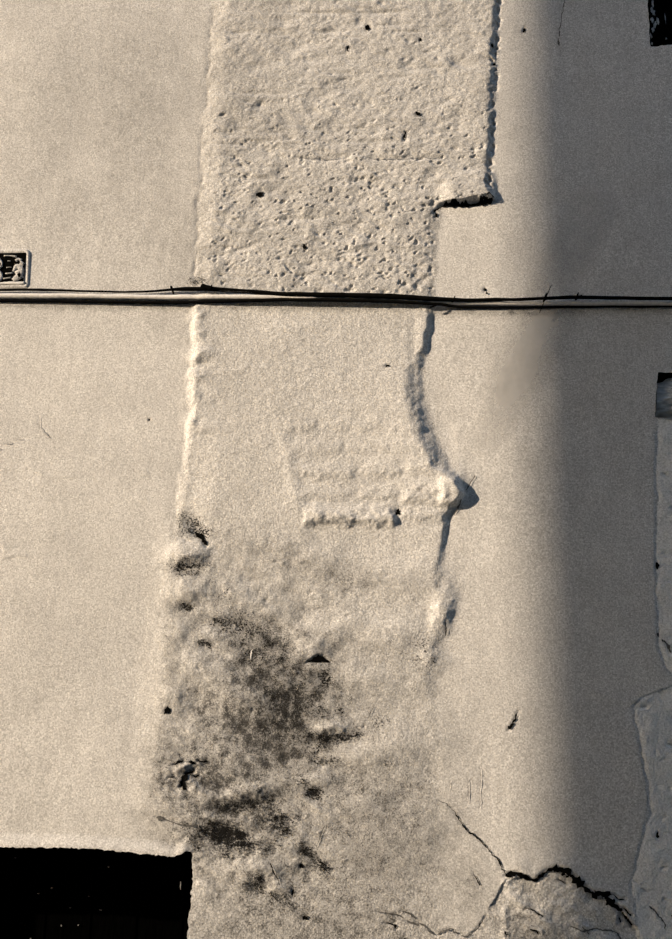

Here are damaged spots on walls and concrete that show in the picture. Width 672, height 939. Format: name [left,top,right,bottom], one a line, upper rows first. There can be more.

damp [177,514,214,540]
spalling [279,411,452,530]
damp [162,552,288,672]
damp [259,668,364,767]
damp [164,748,333,882]
damp [243,869,300,911]
spalling [367,872,639,939]
crack [440,767,672,939]